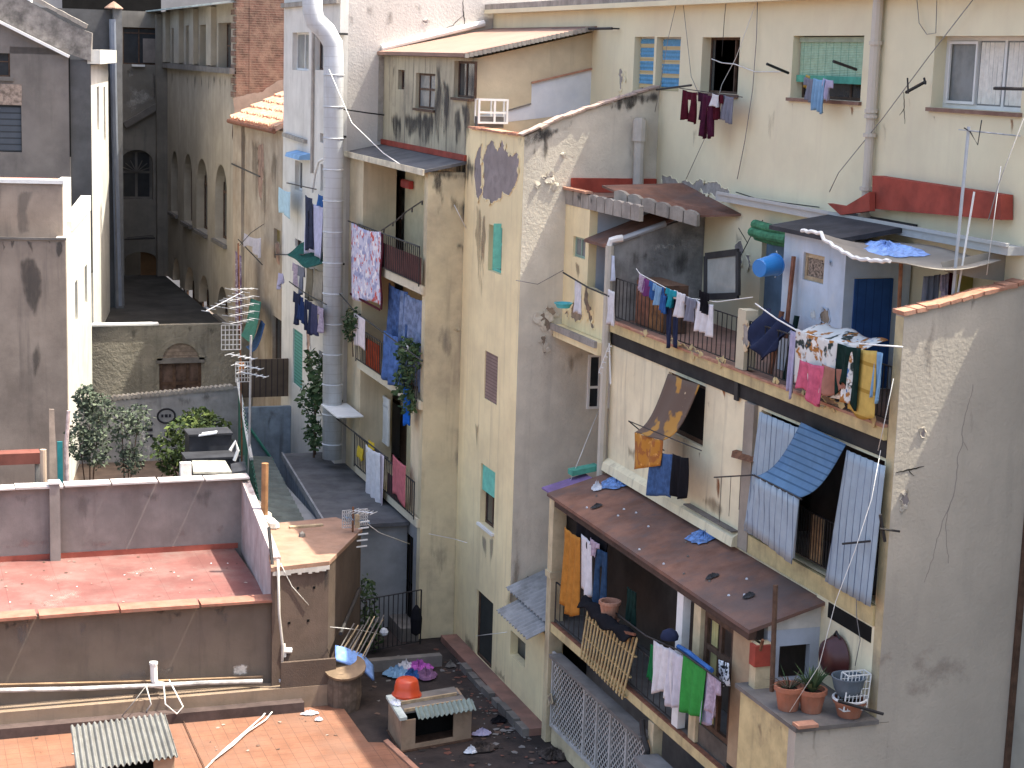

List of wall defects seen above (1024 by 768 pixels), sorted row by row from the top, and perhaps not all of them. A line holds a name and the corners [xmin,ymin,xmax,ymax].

damp [393,69,474,142]
peeling [474,139,520,205]
damp [3,192,31,247]
damp [21,260,40,309]
crack [924,389,973,582]